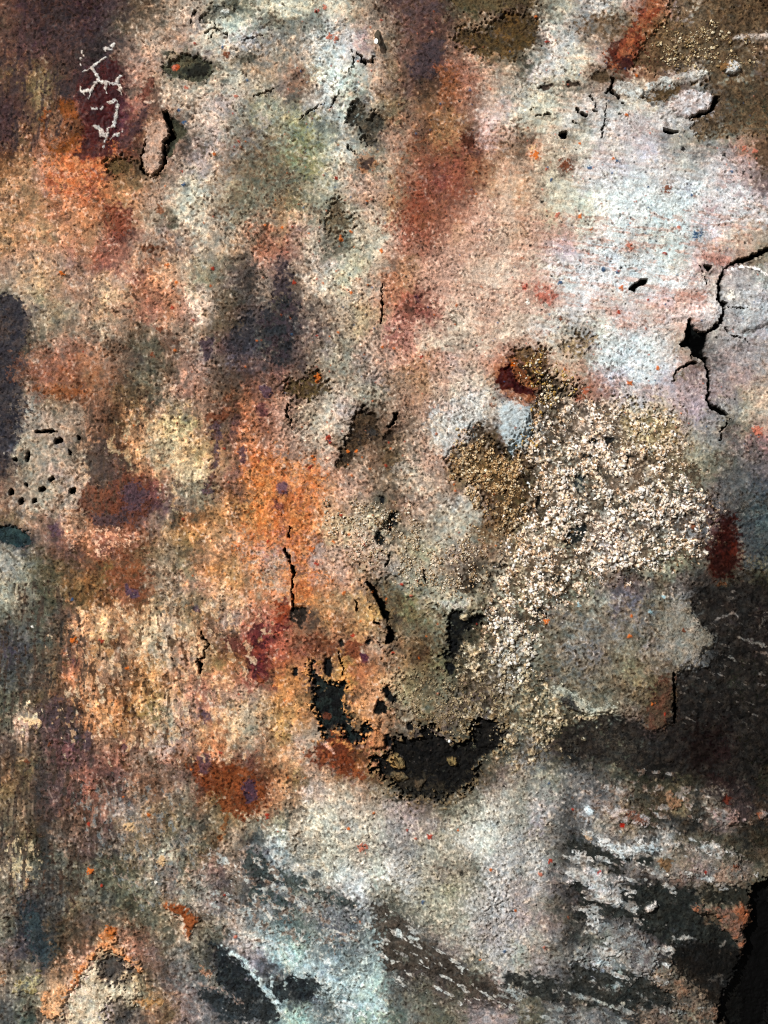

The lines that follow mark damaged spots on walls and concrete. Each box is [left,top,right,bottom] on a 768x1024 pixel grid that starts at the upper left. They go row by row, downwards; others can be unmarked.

crack [60,18,177,178]
peeling [101,117,187,180]
corrosion [354,59,509,342]
crack [671,247,768,442]
water stain [418,370,500,472]
corrosion [200,408,379,688]
crack [283,526,296,612]
water stain [372,559,475,613]
water stain [409,489,490,549]
spalling [322,325,727,774]
corrosion [0,923,164,1024]
peeling [689,901,751,950]